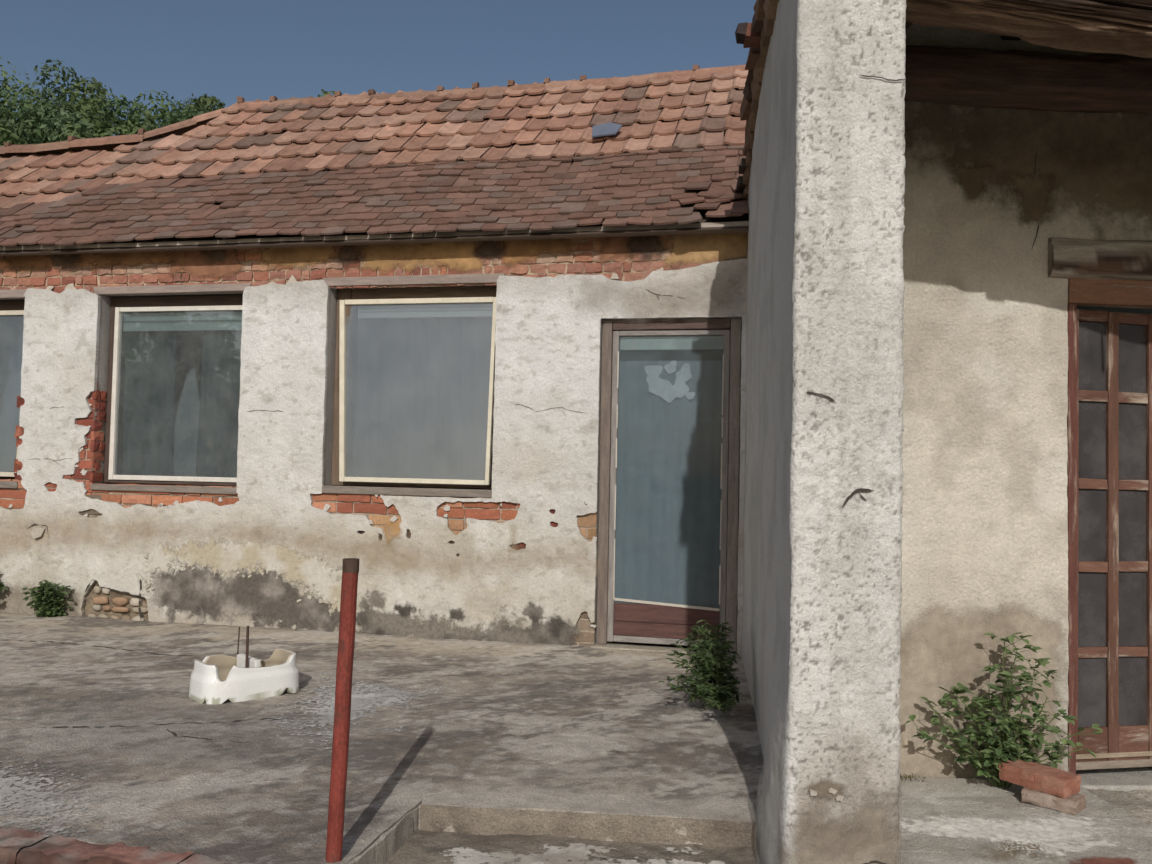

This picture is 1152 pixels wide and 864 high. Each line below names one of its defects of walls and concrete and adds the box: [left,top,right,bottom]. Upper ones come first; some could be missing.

leakage [904,100,1152,228]
flaking render [0,233,748,293]
flaking render [0,425,27,510]
flaking render [46,381,239,518]
flaking render [312,493,411,541]
flaking render [431,496,520,557]
flaking render [577,504,598,543]
leakage [152,563,340,632]
leakage [356,590,580,646]
flaking render [440,843,725,864]